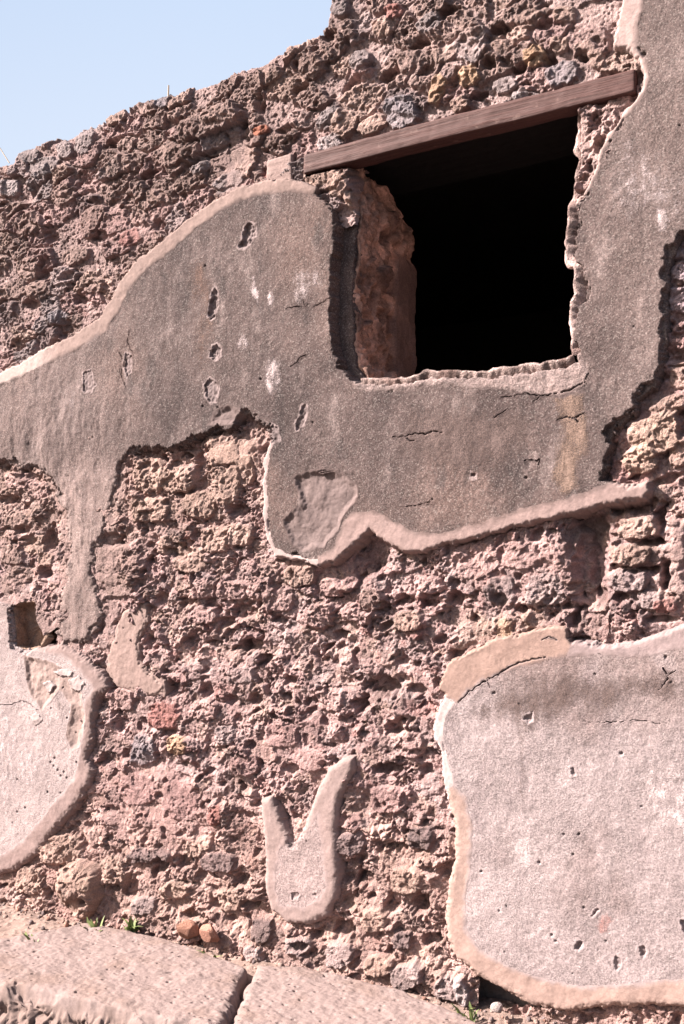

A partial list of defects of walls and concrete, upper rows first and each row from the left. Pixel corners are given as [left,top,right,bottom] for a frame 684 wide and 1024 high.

spalling [574,85,641,211]
flaking render [236,219,259,252]
crack [493,373,590,423]
crack [391,430,443,442]
spalling [0,241,684,1024]
crack [458,635,558,704]